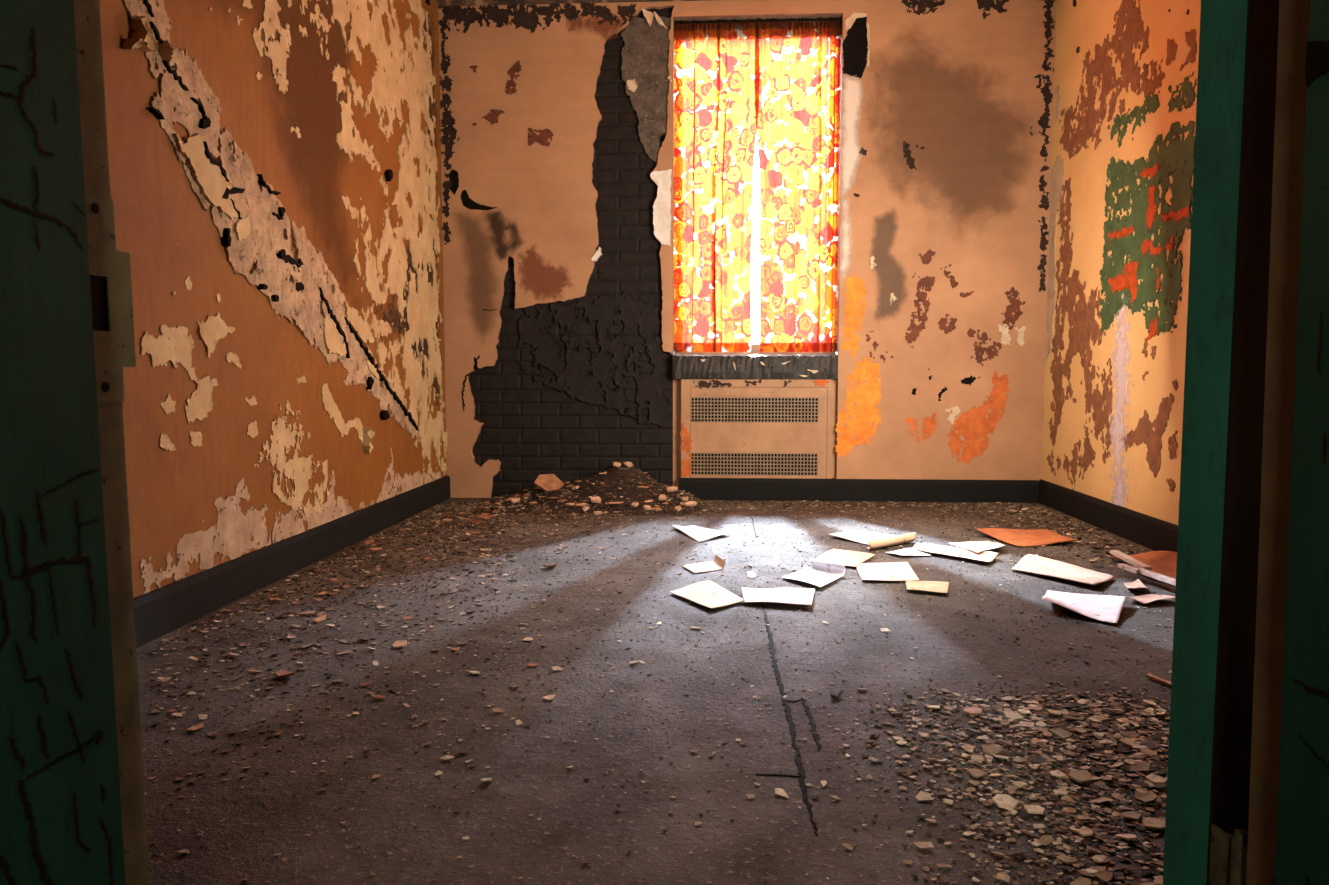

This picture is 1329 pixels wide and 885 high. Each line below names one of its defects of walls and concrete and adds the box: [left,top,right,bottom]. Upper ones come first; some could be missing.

crack [143,0,284,220]
flaking render [842,16,868,79]
peeling [901,0,946,15]
peeling [977,0,1009,19]
crack [284,255,419,430]
flaking render [139,0,694,595]
peeling [835,256,894,457]
peeling [1029,0,1197,492]
crack [755,585,821,836]